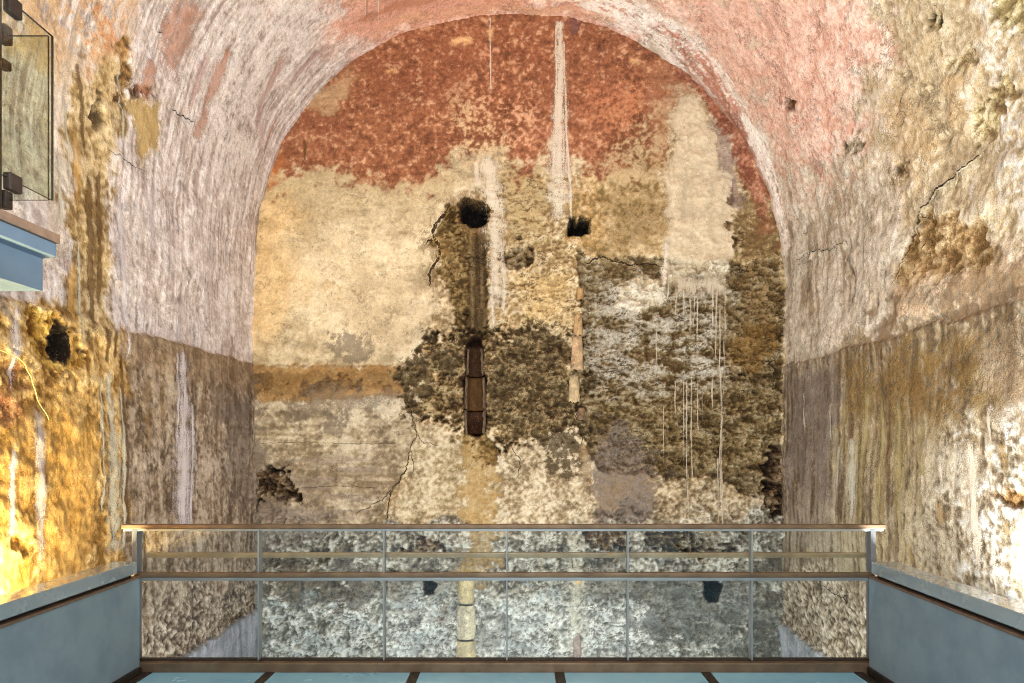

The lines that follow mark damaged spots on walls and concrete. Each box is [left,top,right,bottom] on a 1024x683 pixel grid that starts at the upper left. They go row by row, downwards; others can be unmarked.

water stain [539,18,580,231]
crack [424,206,450,288]
crack [584,255,663,268]
crack [890,152,985,284]
flaking render [24,303,86,380]
water stain [278,150,814,592]
flaking render [396,203,785,517]
water stain [141,317,341,568]
flaking render [257,466,303,506]
crack [259,401,439,521]